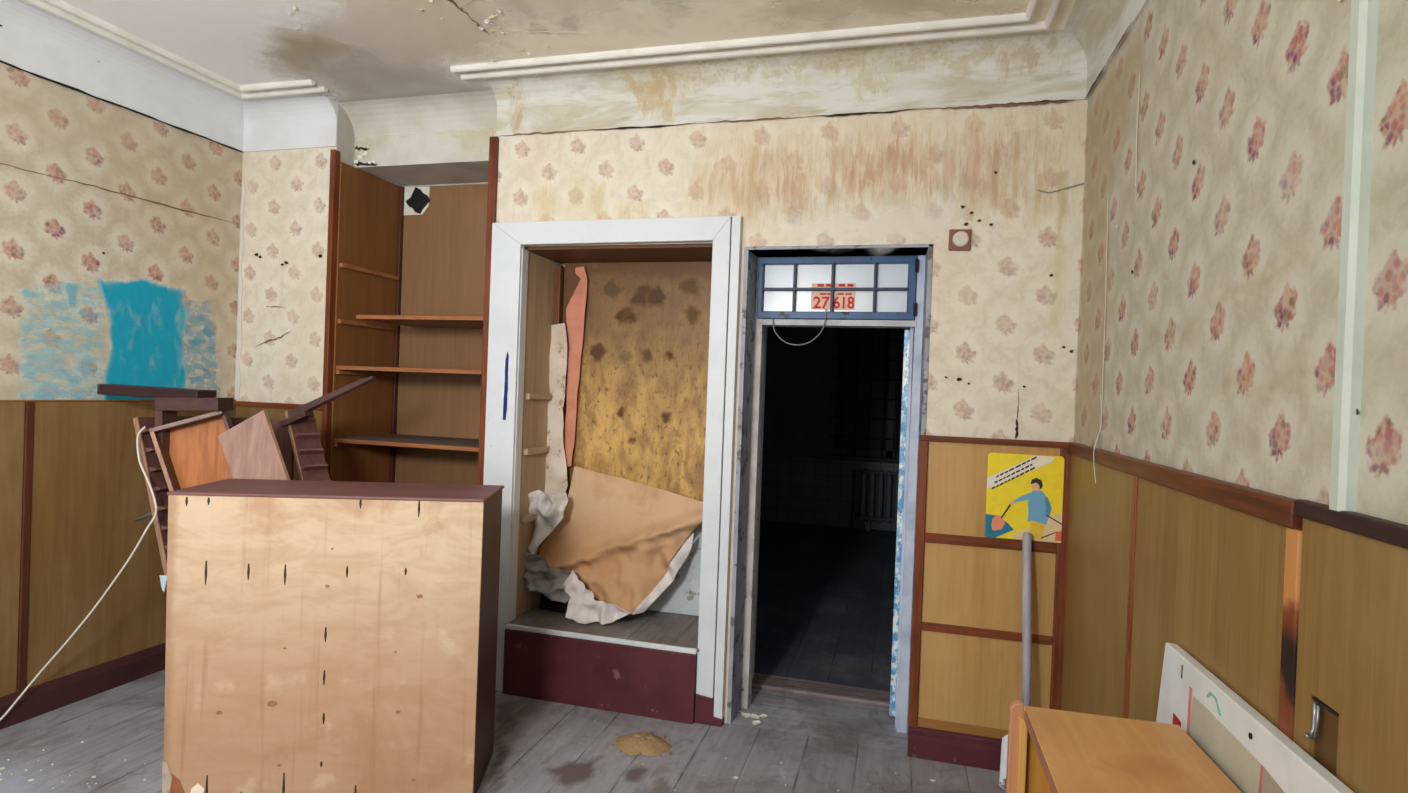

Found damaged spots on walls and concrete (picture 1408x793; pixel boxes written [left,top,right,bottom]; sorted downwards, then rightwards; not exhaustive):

crack [448,0,487,33]
water stain [274,36,362,69]